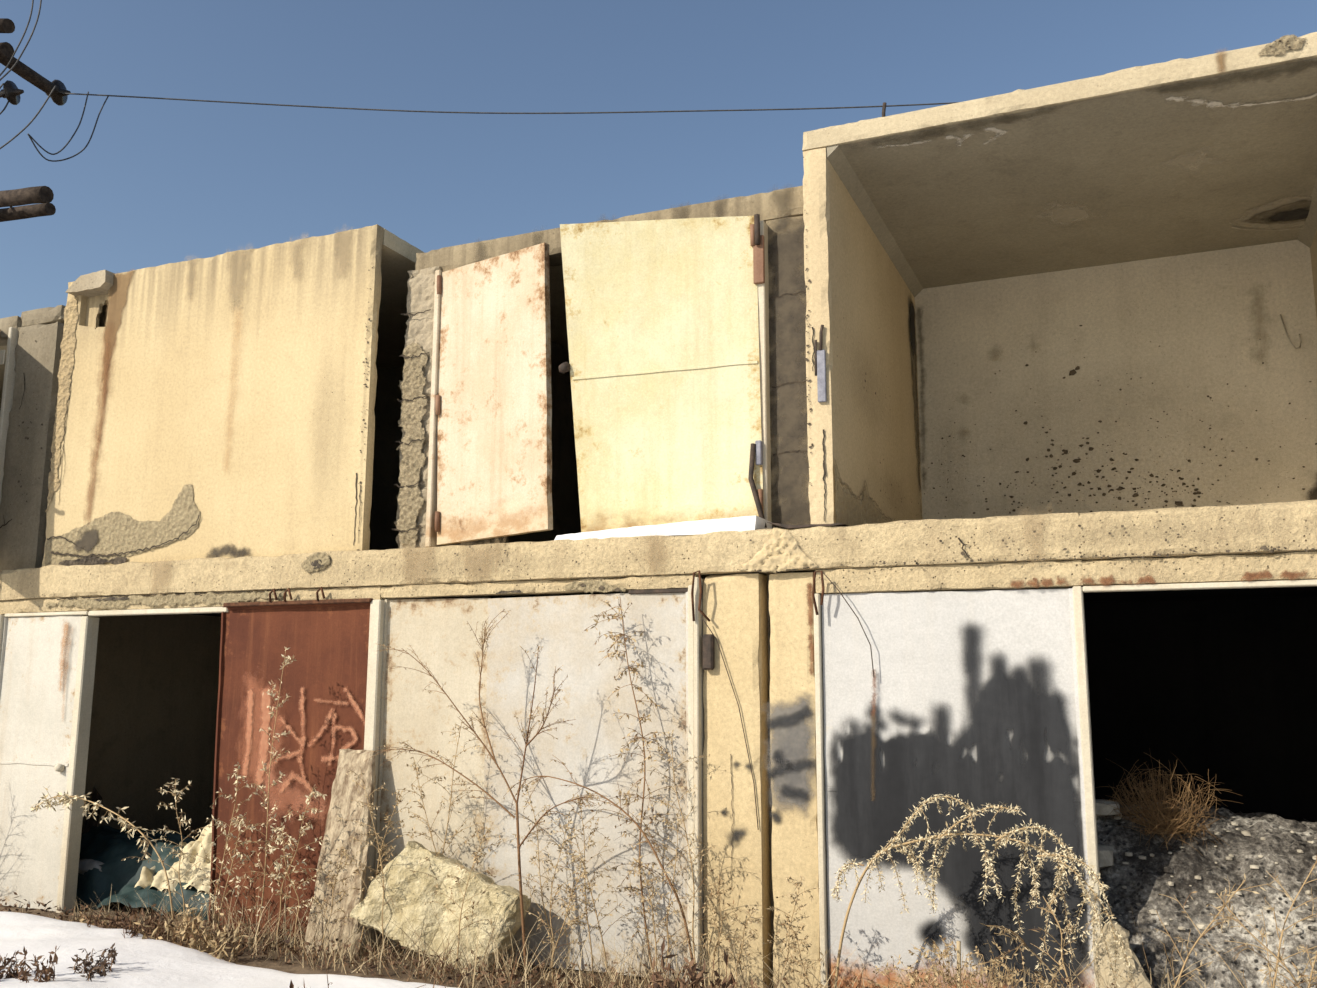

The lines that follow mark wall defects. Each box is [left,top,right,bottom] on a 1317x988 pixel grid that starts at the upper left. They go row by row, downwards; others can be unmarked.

corrosion [1011,575,1155,588]
corrosion [1241,570,1305,581]